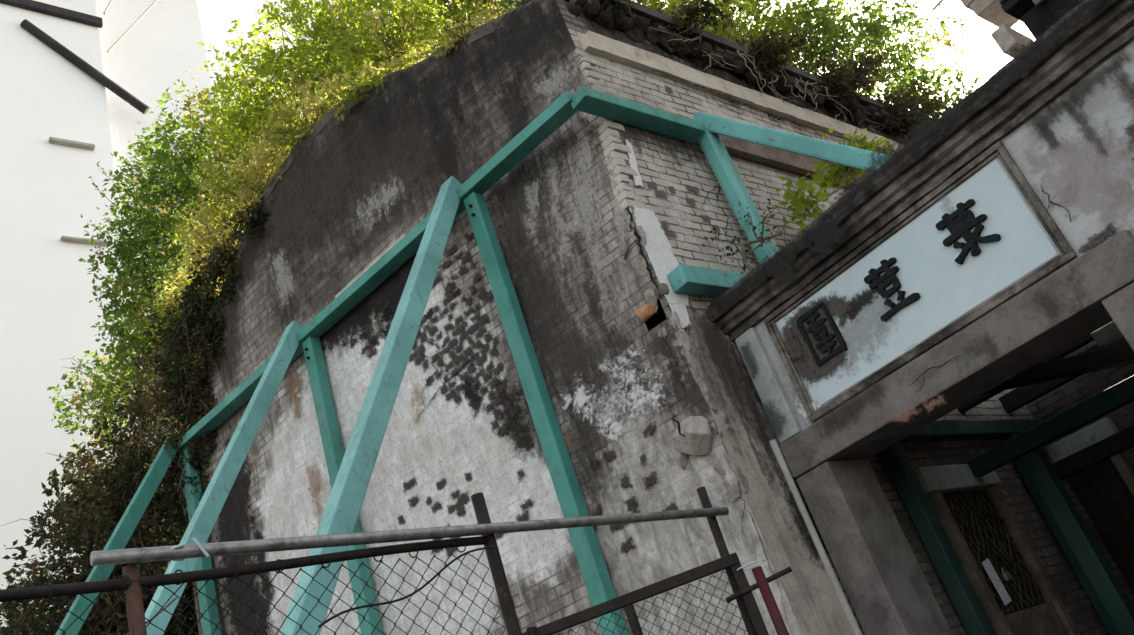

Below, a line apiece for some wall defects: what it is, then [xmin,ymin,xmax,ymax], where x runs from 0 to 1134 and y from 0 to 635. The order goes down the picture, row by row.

leakage [462,374,534,461]
leakage [220,0,872,390]
flaking render [592,453,658,554]
spalling [524,138,749,503]
leakage [490,0,1098,566]
leakage [1033,50,1134,154]